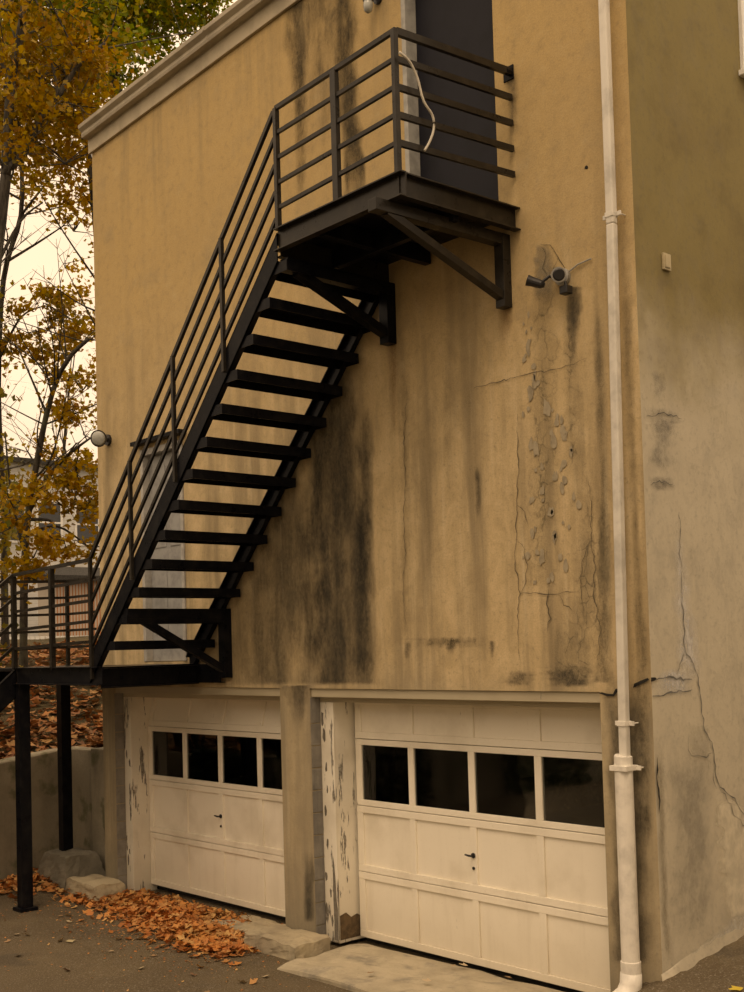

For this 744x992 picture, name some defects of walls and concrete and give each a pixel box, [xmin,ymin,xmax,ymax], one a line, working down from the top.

damp [339,0,364,181]
damp [313,381,368,683]
crack [476,359,583,387]
flaking render [522,311,582,585]
crack [514,414,601,660]
damp [570,287,579,327]
crack [654,517,744,826]
peeling [325,859,361,941]